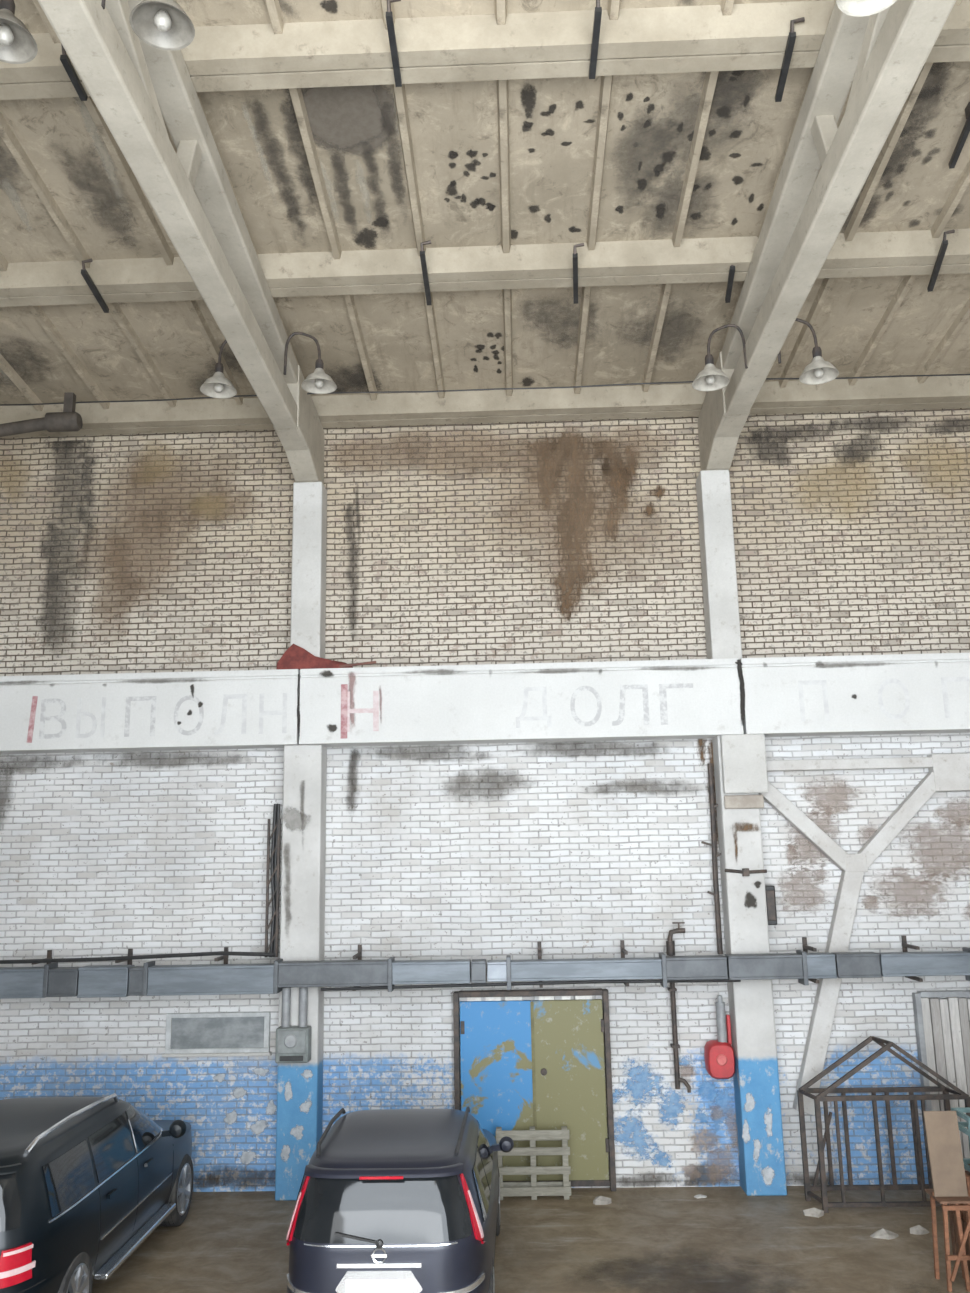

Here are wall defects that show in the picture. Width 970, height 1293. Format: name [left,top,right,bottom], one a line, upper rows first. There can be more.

water stain [254,103,317,228]
water stain [332,154,355,224]
water stain [365,111,404,229]
water stain [658,184,705,227]
water stain [626,70,756,192]
water stain [842,62,947,229]
water stain [642,316,693,352]
water stain [752,417,907,463]
water stain [931,419,970,434]
water stain [126,754,213,767]
peeling [214,1069,313,1161]
peeling [613,1060,775,1185]